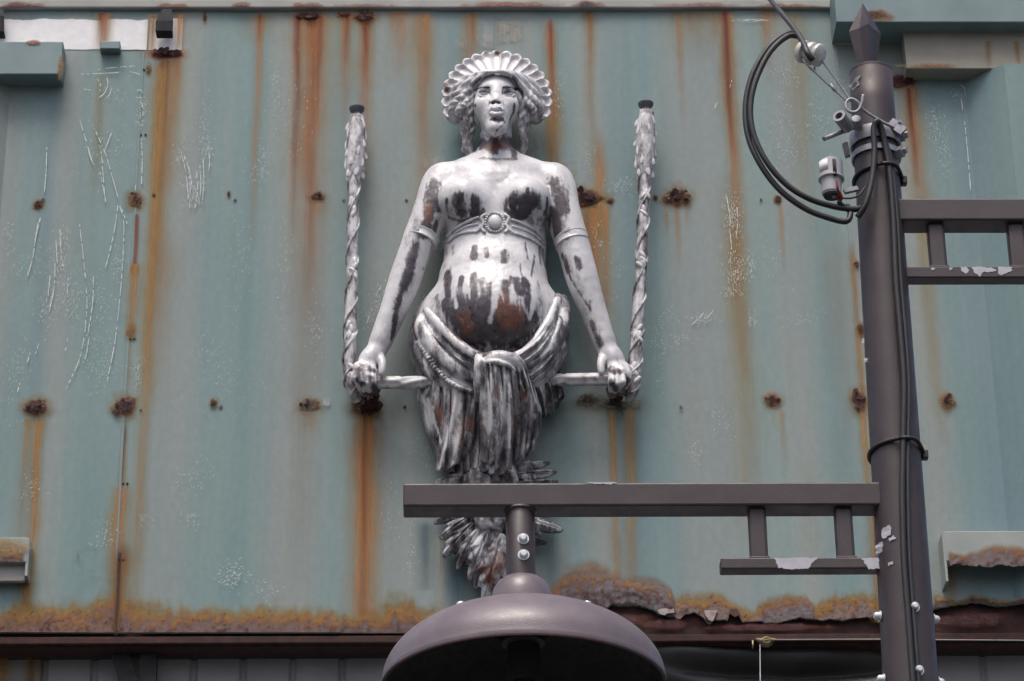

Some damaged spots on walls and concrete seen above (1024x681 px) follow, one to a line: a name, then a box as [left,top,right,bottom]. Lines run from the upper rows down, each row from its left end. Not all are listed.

corrosion [294,3,322,154]
corrosion [662,3,739,219]
corrosion [126,3,187,373]
corrosion [309,191,325,202]
corrosion [577,155,614,273]
corrosion [653,188,691,207]
corrosion [764,393,782,407]
corrosion [850,323,867,465]
corrosion [940,393,956,409]
corrosion [0,396,441,634]
corrosion [551,566,879,631]
corrosion [934,595,1024,626]